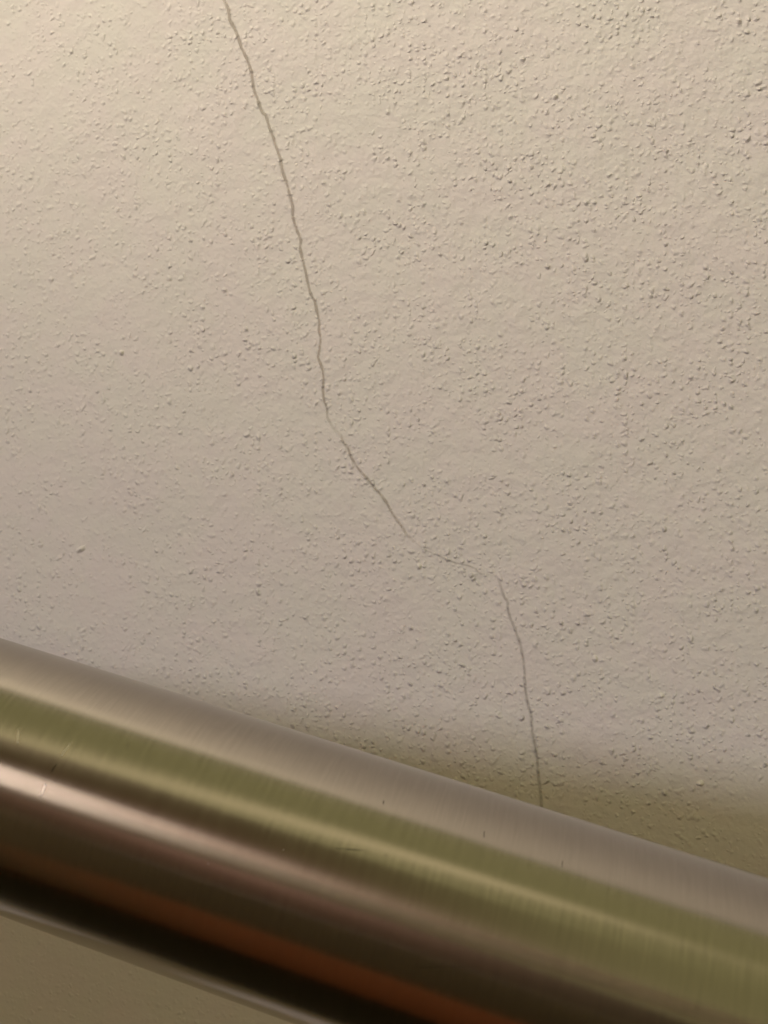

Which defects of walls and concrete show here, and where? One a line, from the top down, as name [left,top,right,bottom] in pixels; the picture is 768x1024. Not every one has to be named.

crack [226,4,326,406]